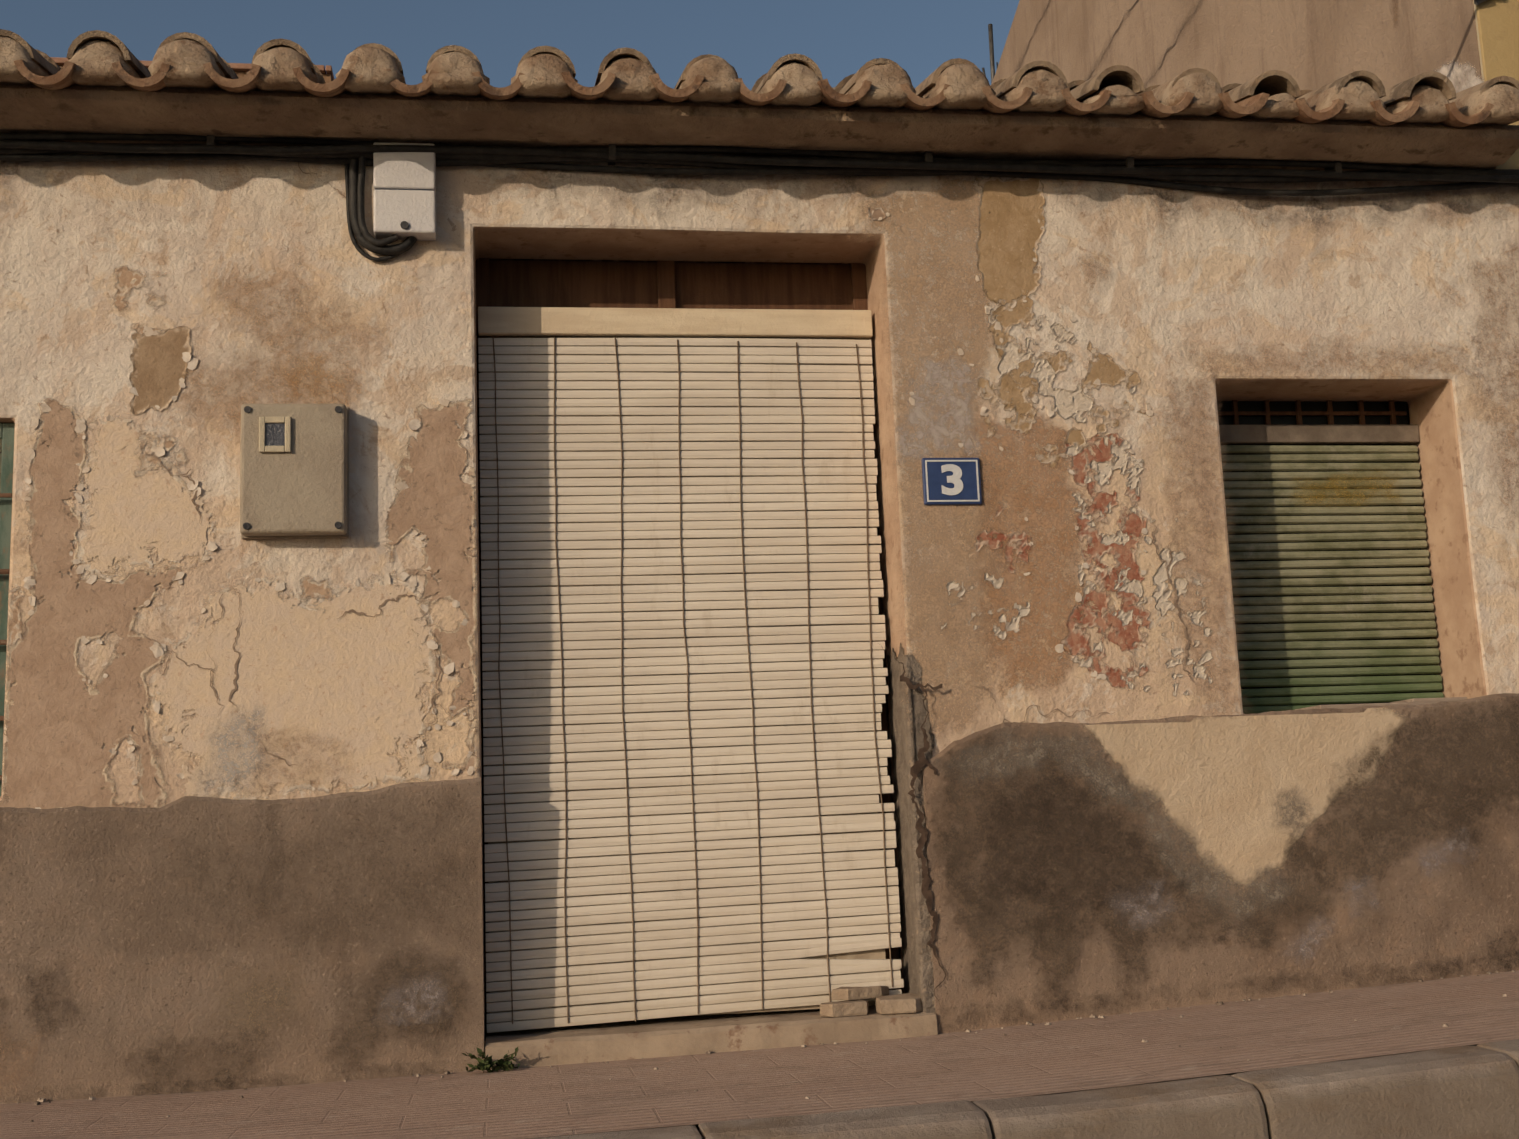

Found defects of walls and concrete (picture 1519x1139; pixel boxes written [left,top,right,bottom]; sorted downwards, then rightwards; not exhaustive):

crack [153,585,296,787]
peeling [0,266,479,809]
crack [337,592,452,757]
flaking render [887,643,935,1013]
peeling [899,177,1213,696]
water stain [938,704,1519,1009]